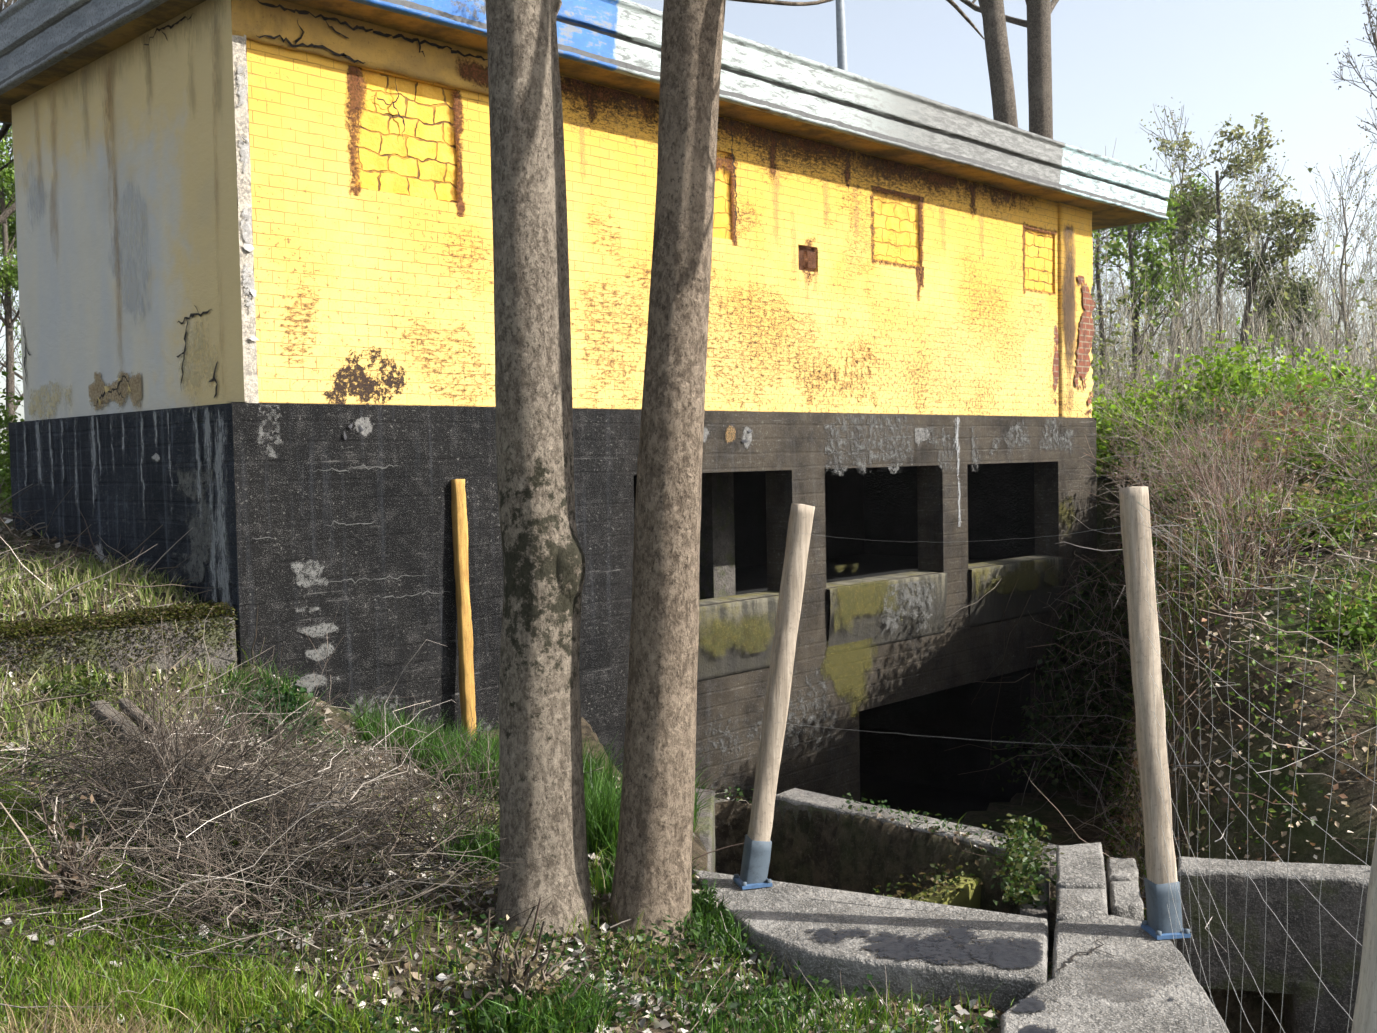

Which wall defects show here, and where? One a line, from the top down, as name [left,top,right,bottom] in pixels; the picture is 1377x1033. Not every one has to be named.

crack [256,0,488,64]
crack [372,78,405,140]
water stain [562,77,659,148]
water stain [717,124,1006,302]
spalling [88,371,142,410]
crack [177,305,218,398]
water stain [323,318,495,406]
water stain [706,259,877,408]
water stain [24,416,125,504]
water stain [140,408,232,618]